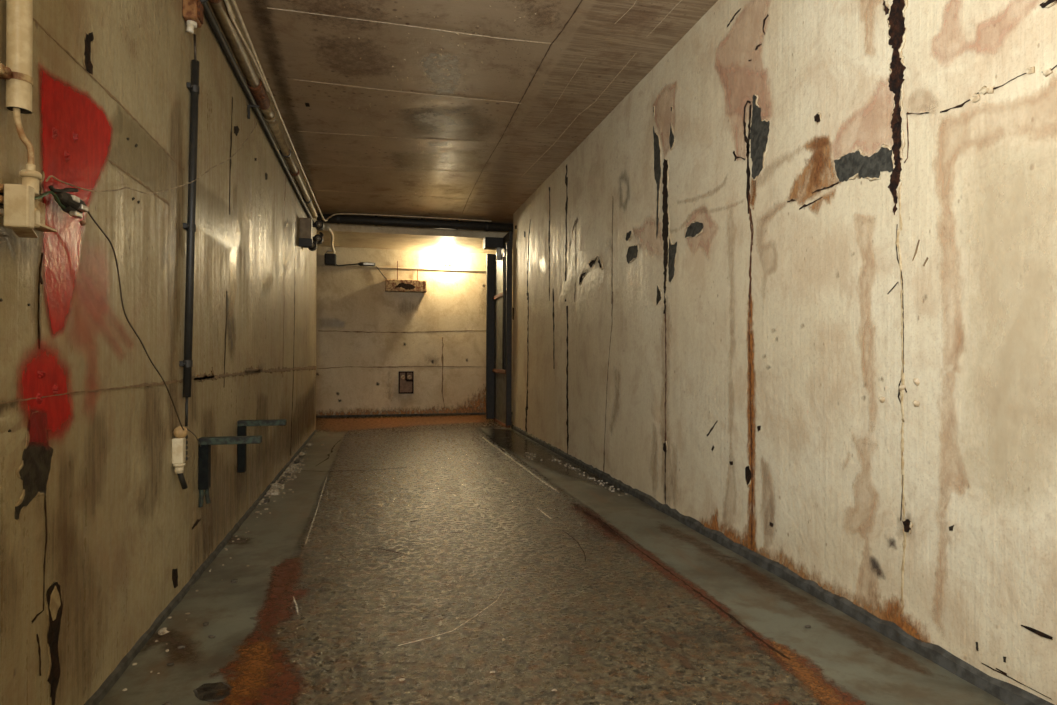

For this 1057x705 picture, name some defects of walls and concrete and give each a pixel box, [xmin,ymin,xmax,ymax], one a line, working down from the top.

spalling [750,94,770,181]
spalling [834,0,908,215]
crack [904,65,1057,163]
peeling [579,255,603,285]
peeling [625,230,639,264]
crack [887,224,907,404]
peeling [15,411,53,520]
corrosion [701,296,927,643]
corrosion [571,504,730,618]
peeling [45,580,63,705]
corrosion [219,641,277,705]
corrosion [736,626,866,705]